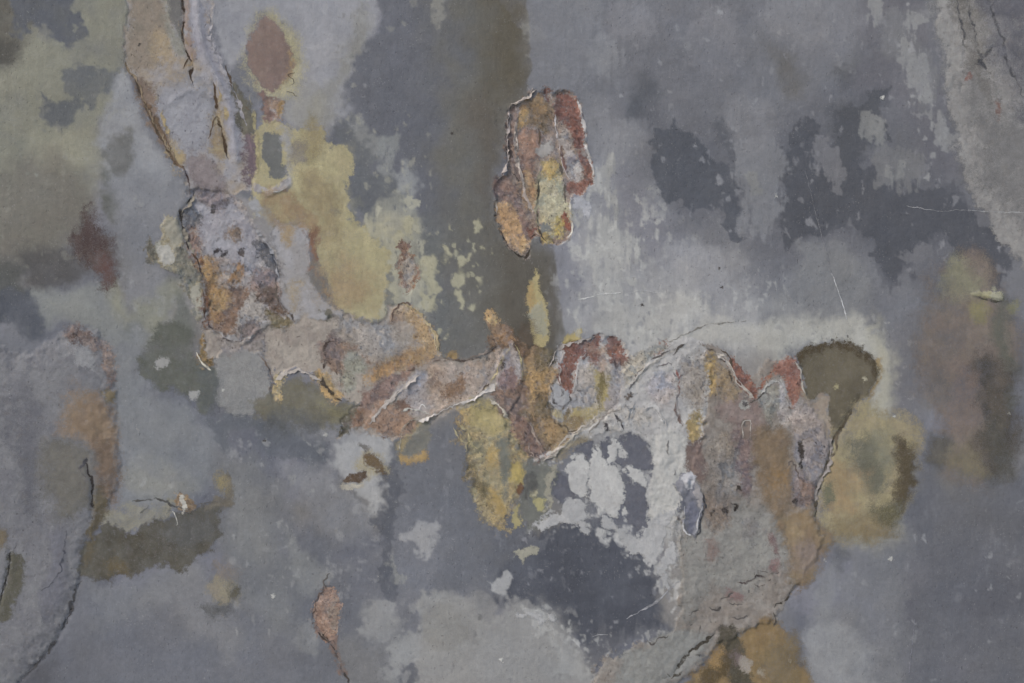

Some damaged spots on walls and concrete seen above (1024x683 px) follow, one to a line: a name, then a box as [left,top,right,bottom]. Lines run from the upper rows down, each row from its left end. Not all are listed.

crack [957,1,1023,97]
damp [248,110,394,323]
flaking render [121,0,838,683]
damp [796,243,1024,549]
crack [78,458,94,519]
crack [0,552,11,604]
crack [24,536,82,677]